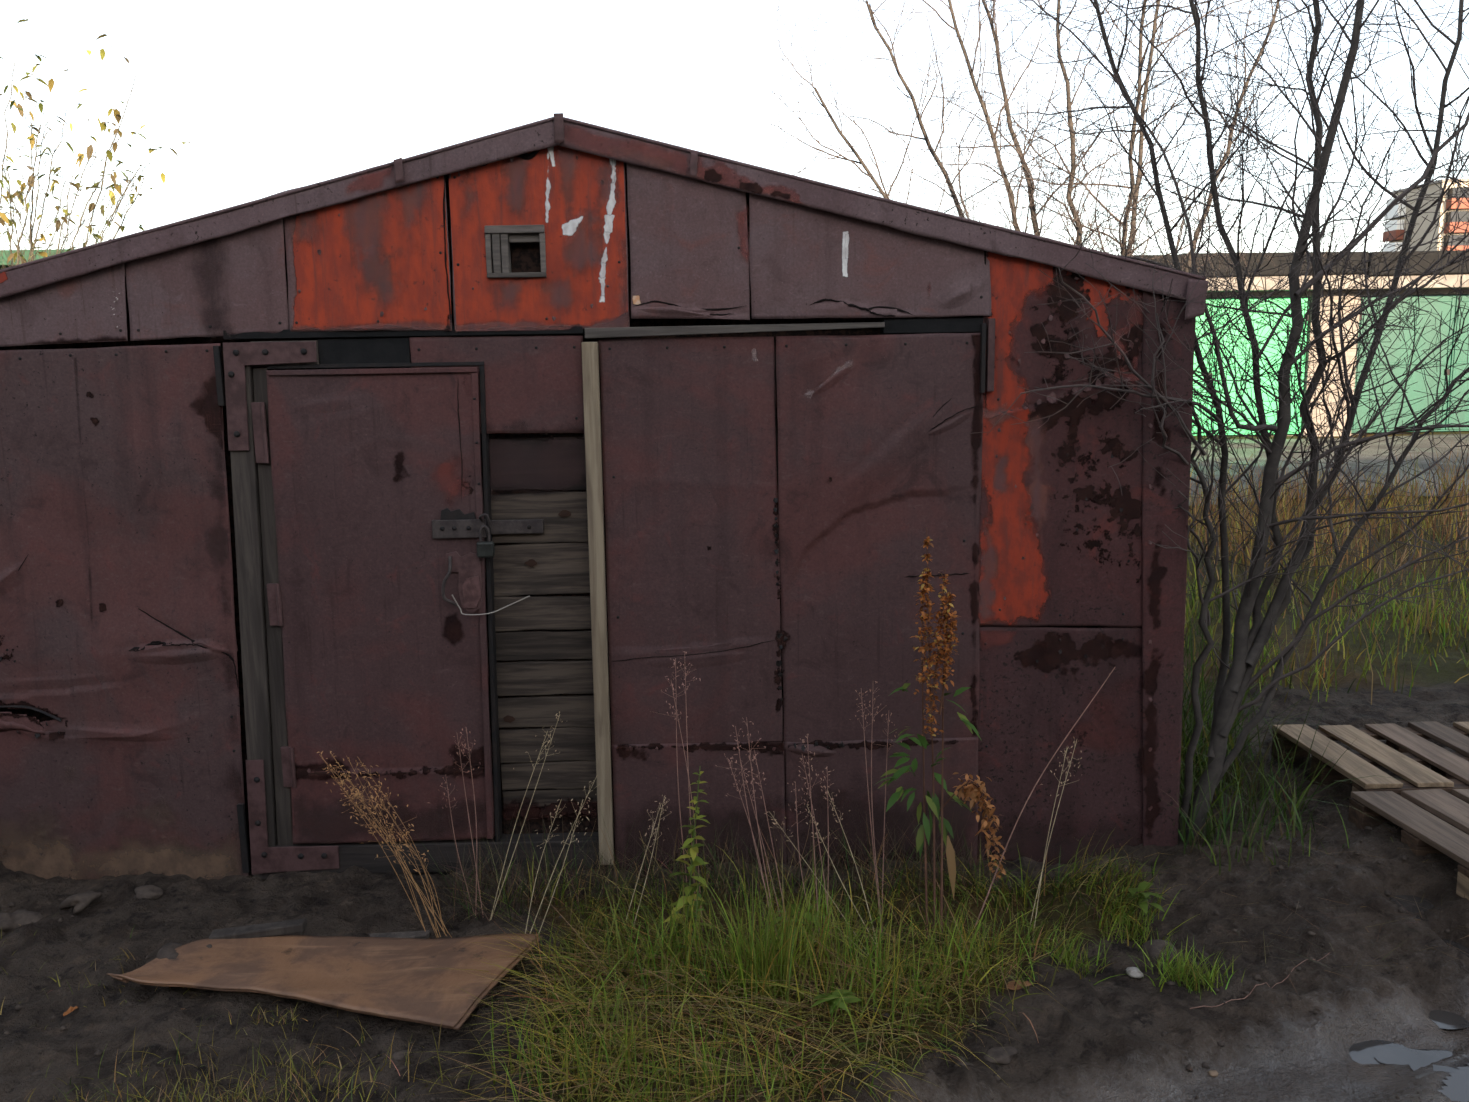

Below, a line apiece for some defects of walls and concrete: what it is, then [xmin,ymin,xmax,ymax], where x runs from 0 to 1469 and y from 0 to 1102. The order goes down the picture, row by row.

rust [971,334,983,502]
peeling [978,252,1143,626]
rust [969,543,980,639]
rust [1014,272,1170,839]
rust [617,674,978,761]